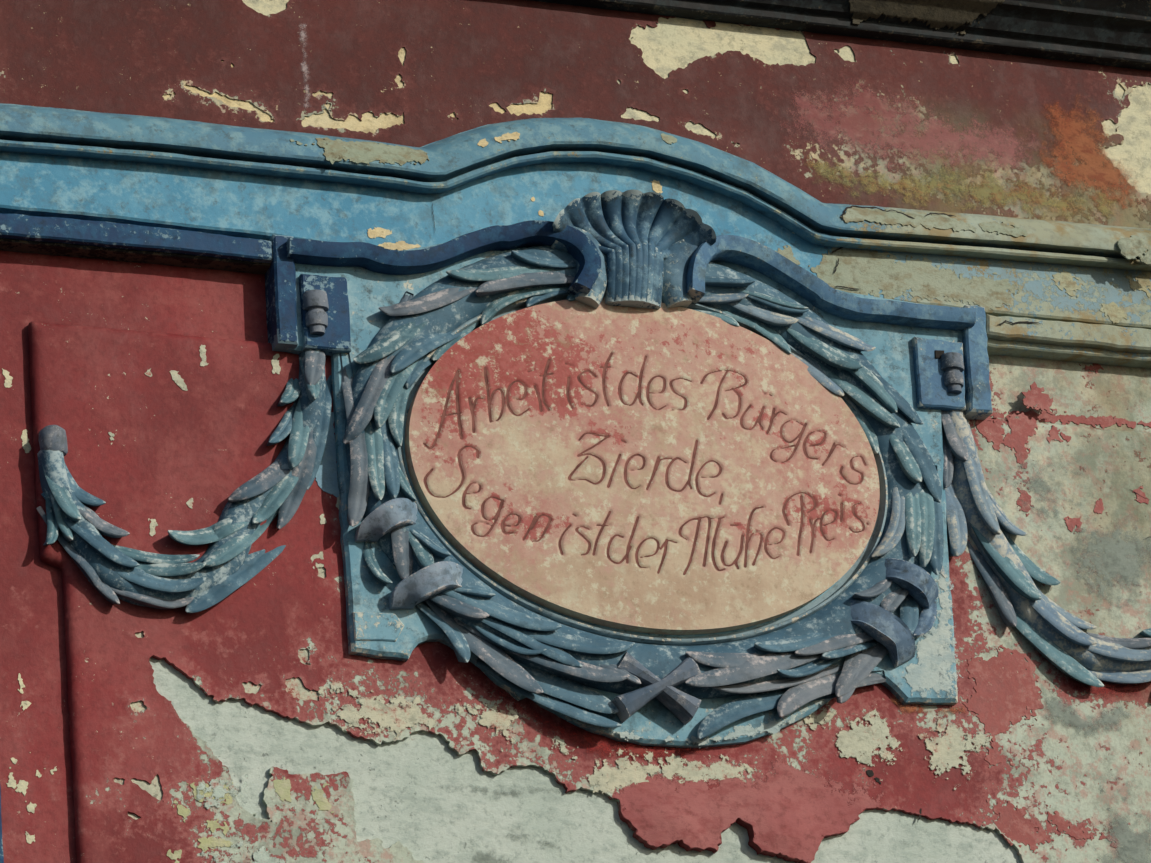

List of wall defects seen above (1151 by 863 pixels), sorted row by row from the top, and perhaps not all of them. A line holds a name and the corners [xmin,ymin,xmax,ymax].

peeling [242,0,289,15]
peeling [629,17,816,79]
peeling [834,46,855,62]
peeling [163,85,274,122]
spalling [290,89,429,166]
peeling [1101,84,1151,194]
peeling [840,207,1027,238]
peeling [975,411,1071,469]
spalling [113,657,795,863]
peeling [804,701,905,784]
peeling [918,718,993,790]
spalling [811,799,1120,863]